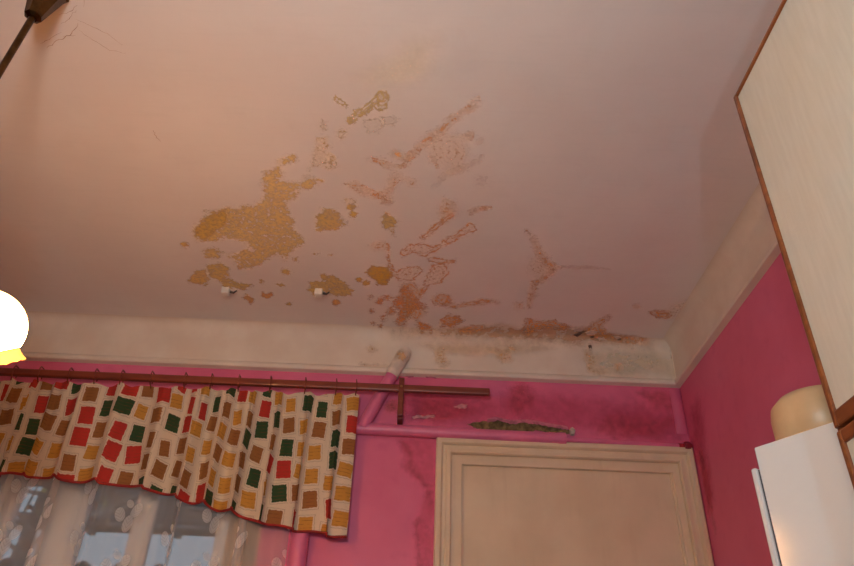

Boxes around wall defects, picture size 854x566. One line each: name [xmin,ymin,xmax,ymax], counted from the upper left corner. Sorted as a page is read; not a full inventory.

flaking render [468,417,575,436]